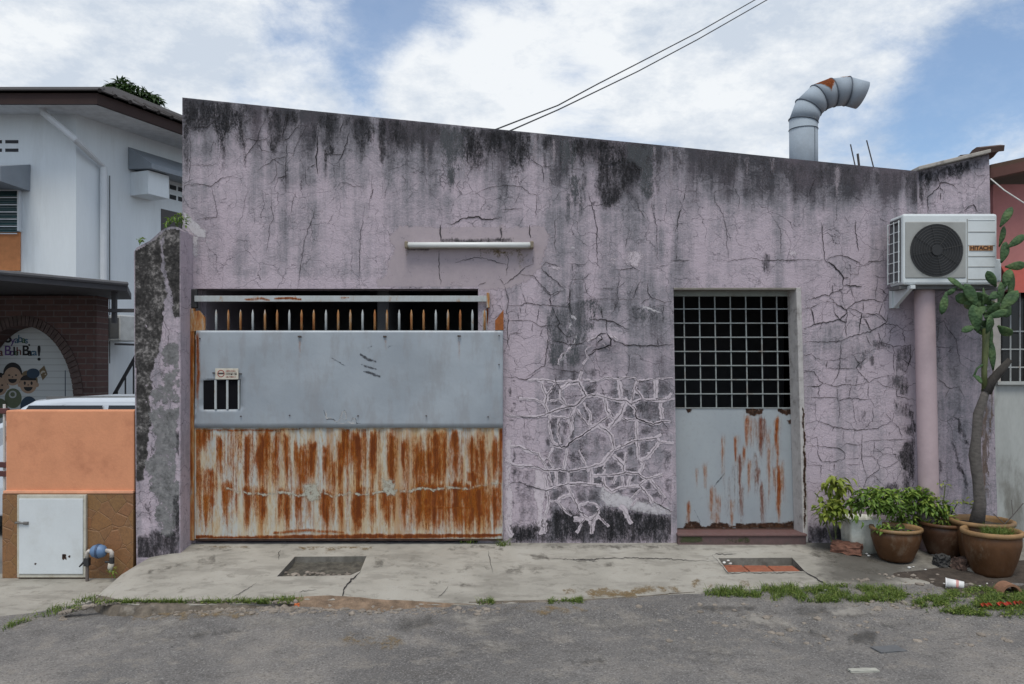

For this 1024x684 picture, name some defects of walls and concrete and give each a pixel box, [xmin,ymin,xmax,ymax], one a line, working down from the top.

water stain [313,113,334,170]
water stain [354,118,681,217]
water stain [894,161,978,201]
rust [190,331,200,417]
crack [438,140,915,533]
water stain [138,496,179,557]
rust [190,428,503,539]
peeling [533,469,546,536]
water stain [512,444,703,543]
peeling [600,486,671,516]
rust [684,408,807,528]